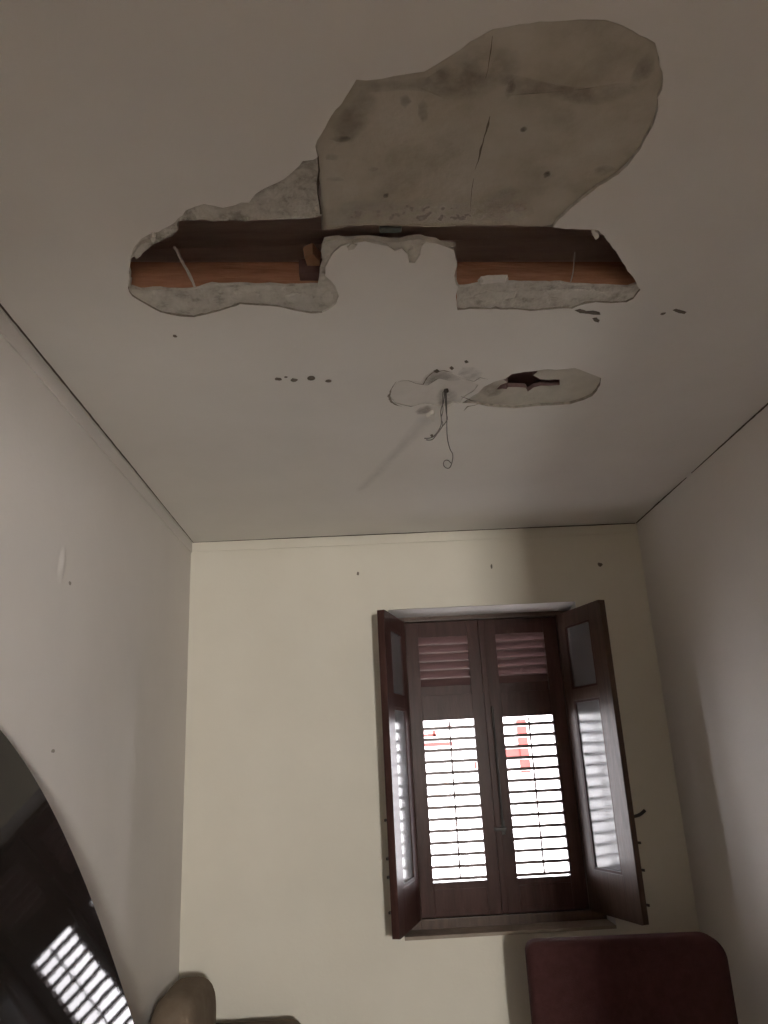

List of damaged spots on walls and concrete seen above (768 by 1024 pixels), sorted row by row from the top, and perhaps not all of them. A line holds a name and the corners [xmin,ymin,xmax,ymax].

flaking render [128,20,663,323]
spalling [387,360,601,437]